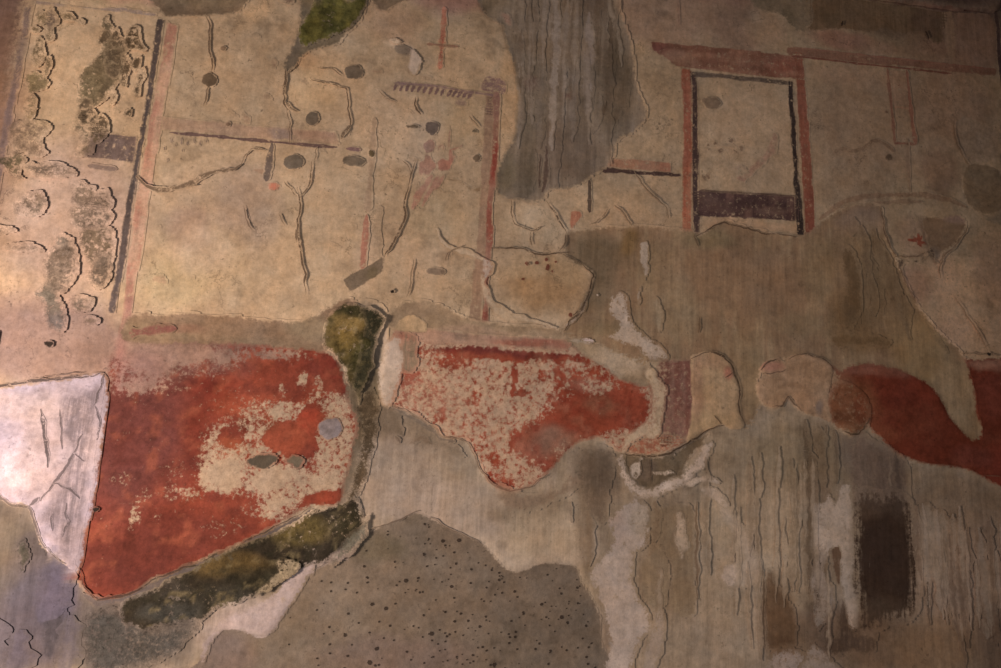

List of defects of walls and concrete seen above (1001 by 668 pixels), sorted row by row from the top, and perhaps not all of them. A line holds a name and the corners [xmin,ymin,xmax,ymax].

crack [135,61,352,194]
flaking render [282,0,370,72]
damp [512,0,633,198]
crack [279,146,318,291]
crack [384,160,416,297]
crack [491,200,594,331]
flaking render [118,256,848,668]
damp [435,217,1001,668]
flaking render [0,500,55,668]
flaking render [67,578,125,622]
damp [198,565,315,664]
flaking render [832,427,1001,668]